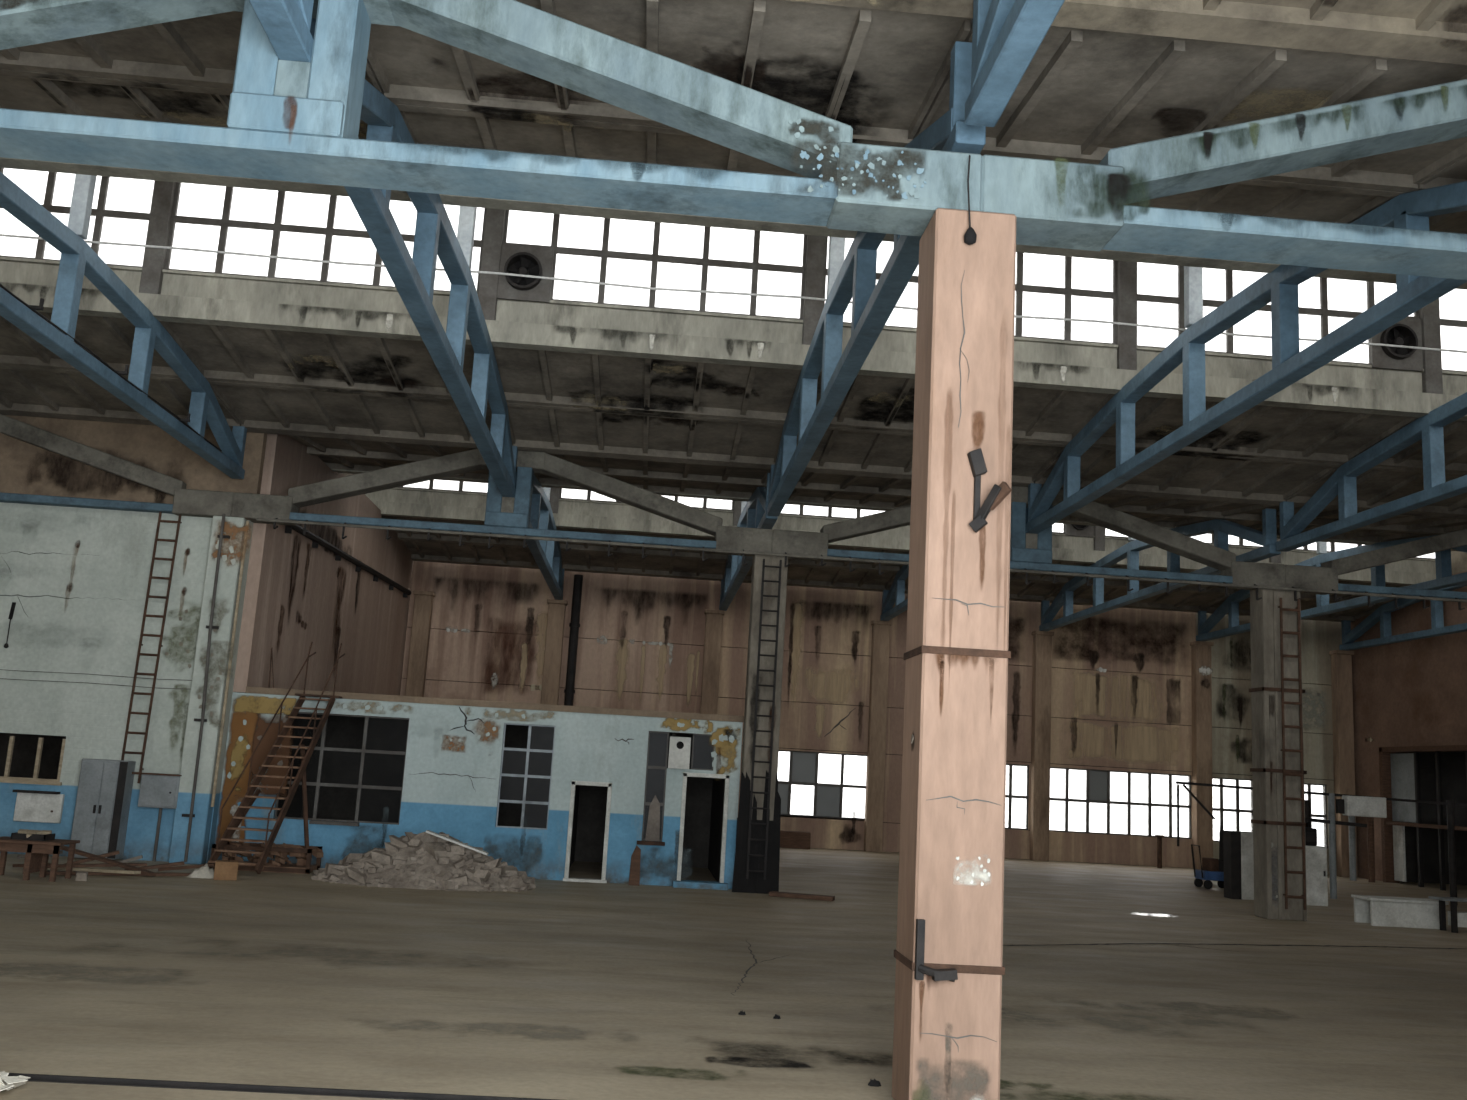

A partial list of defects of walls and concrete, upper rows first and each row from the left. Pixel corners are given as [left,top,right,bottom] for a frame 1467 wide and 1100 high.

rust [285,97,297,132]
water stain [1154,89,1356,155]
water stain [1391,86,1448,116]
peeling [788,118,927,200]
water stain [572,329,758,430]
water stain [855,389,915,430]
water stain [485,583,548,690]
water stain [605,589,705,703]
water stain [170,685,188,755]
flaking render [662,718,740,774]